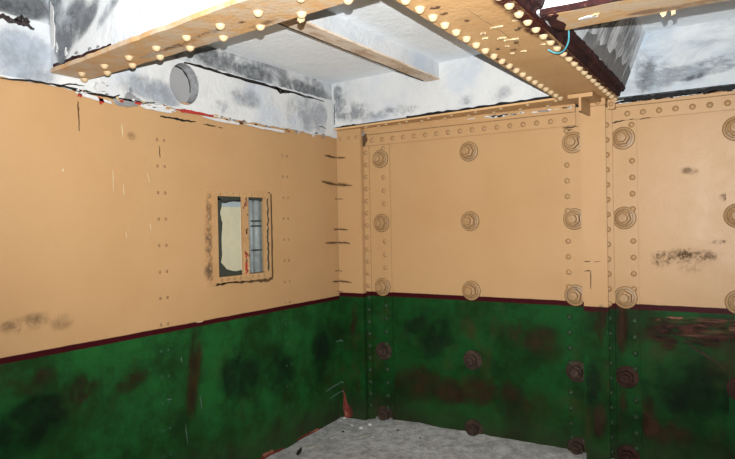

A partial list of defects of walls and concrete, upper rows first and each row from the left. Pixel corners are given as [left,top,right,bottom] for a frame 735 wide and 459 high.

crack [0,13,35,30]
corrosion [495,0,626,97]
leakage [640,59,734,88]
peeling [75,87,303,134]
crack [184,62,335,129]
leakage [334,87,364,119]
corrosion [649,317,735,348]